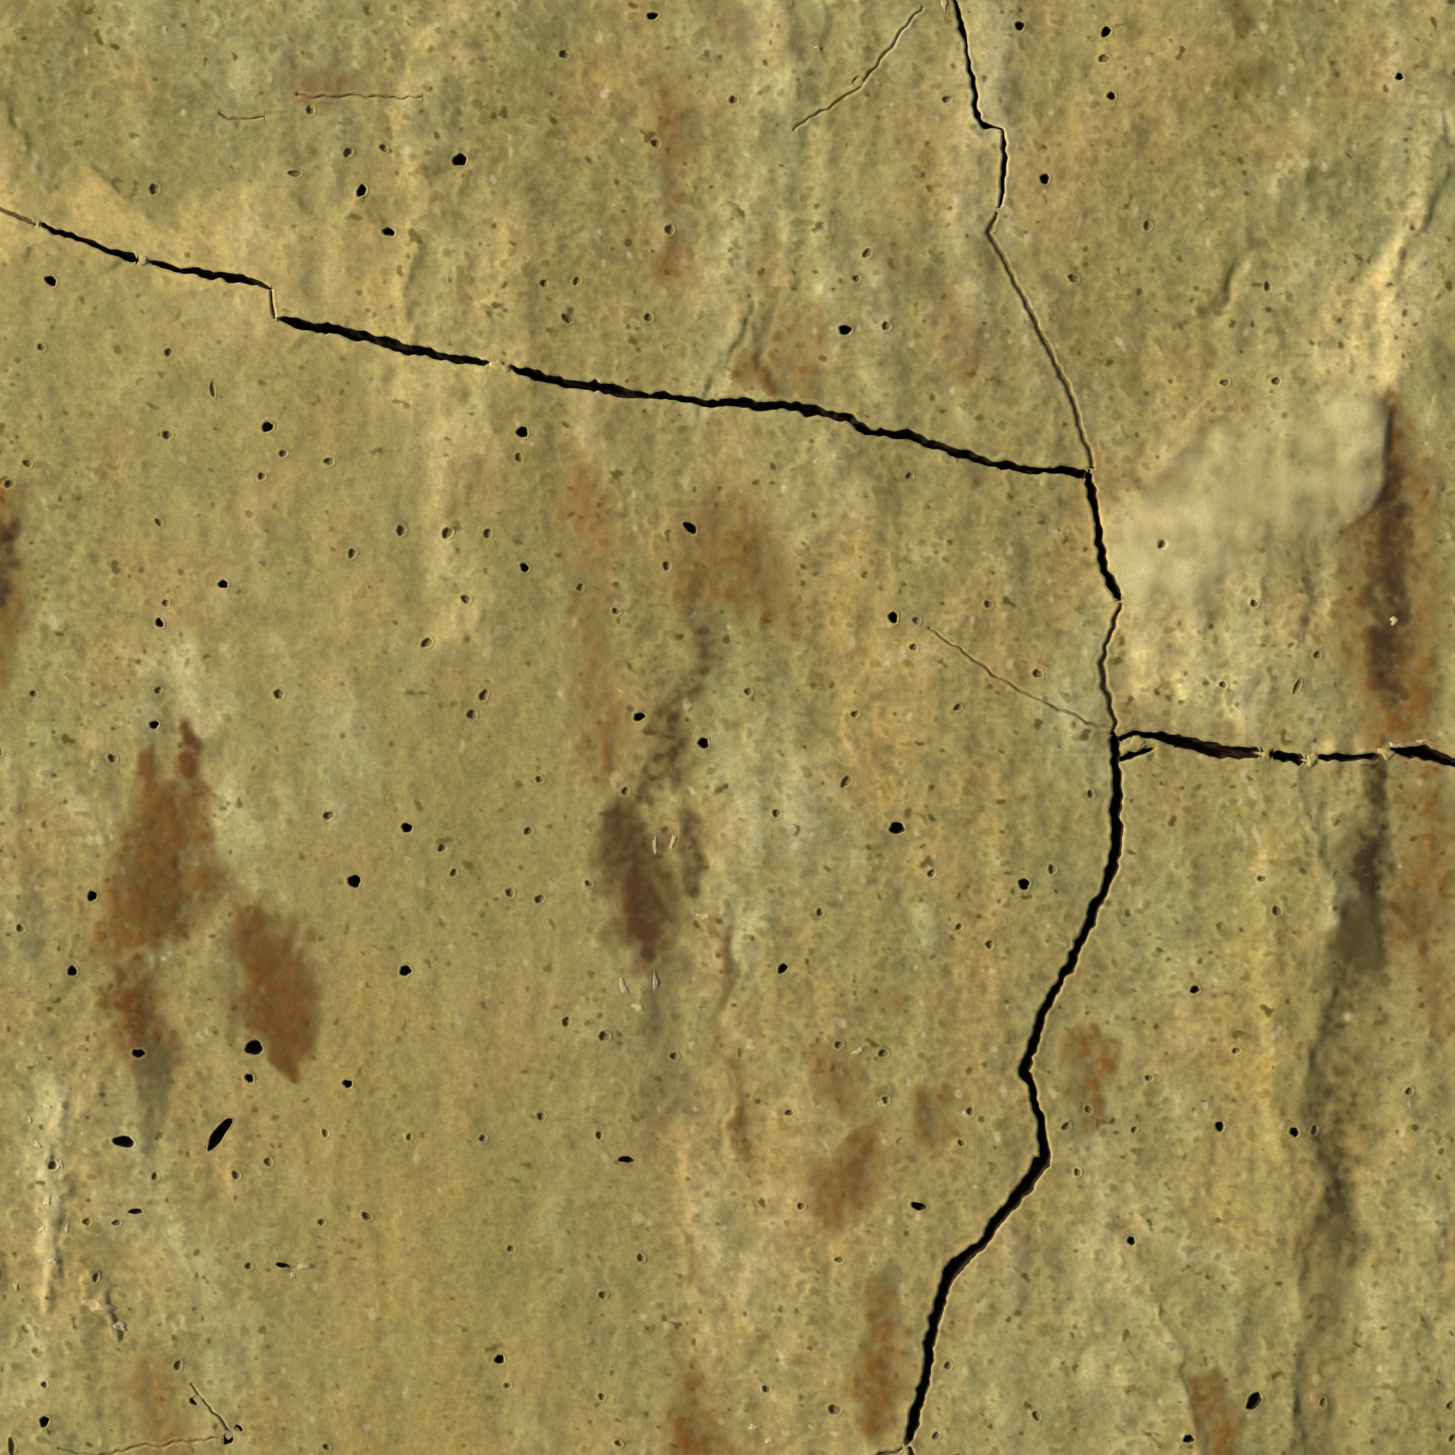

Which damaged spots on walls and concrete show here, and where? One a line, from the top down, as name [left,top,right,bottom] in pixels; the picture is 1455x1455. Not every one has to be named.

crack [218,109,264,126]
crack [297,89,422,109]
crack [0,201,490,373]
rust [0,488,21,686]
rust [681,505,772,622]
rust [1345,390,1442,745]
rust [600,618,713,973]
crack [510,0,1455,1455]
rust [96,721,218,1074]
rust [233,908,316,1080]
leakage [1308,739,1429,1269]
crack [59,1382,240,1455]